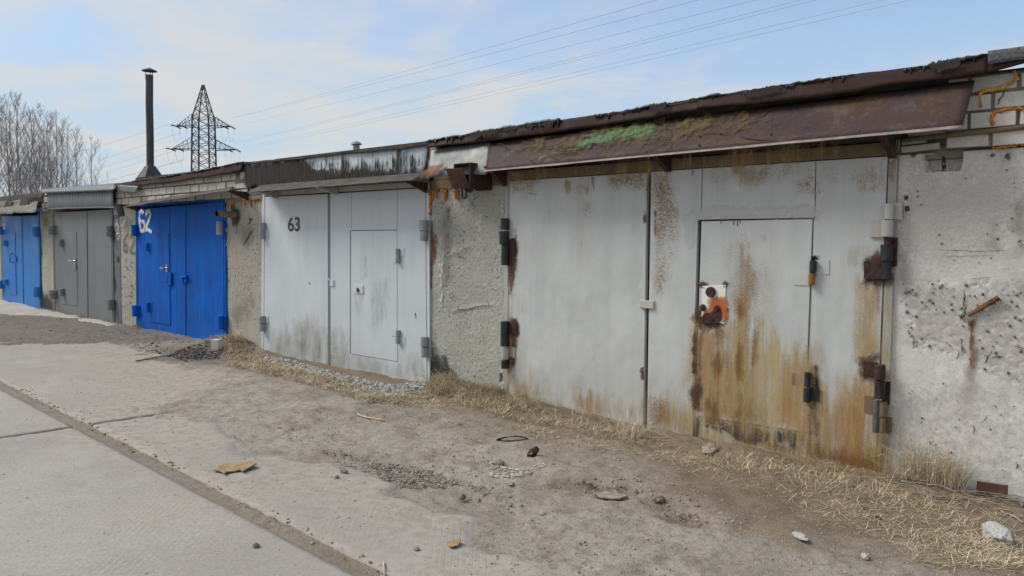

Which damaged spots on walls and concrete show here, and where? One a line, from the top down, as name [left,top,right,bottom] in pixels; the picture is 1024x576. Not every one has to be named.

rust [598,160,678,237]
rust [508,235,518,294]
rust [508,318,538,397]
rust [631,245,894,474]
rust [967,319,977,377]